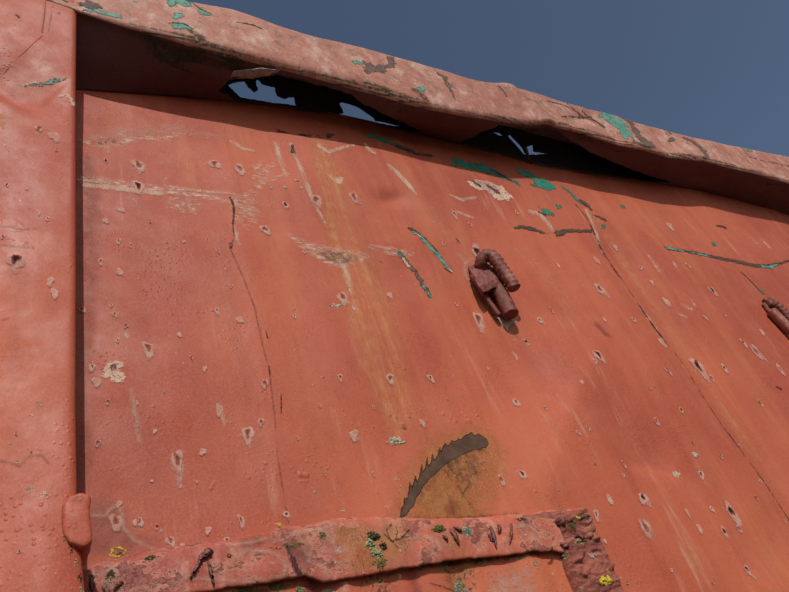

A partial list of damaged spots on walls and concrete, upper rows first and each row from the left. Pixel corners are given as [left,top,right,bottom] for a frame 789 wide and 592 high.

peeling [77,0,122,18]
peeling [166,0,212,30]
peeling [351,56,397,73]
peeling [582,111,656,148]
peeling [451,158,593,211]
crack [229,196,238,248]
crack [514,204,677,356]
crack [691,377,789,520]
rust [405,434,494,545]
rust [488,523,513,548]
rust [88,575,124,592]
rust [189,547,215,585]